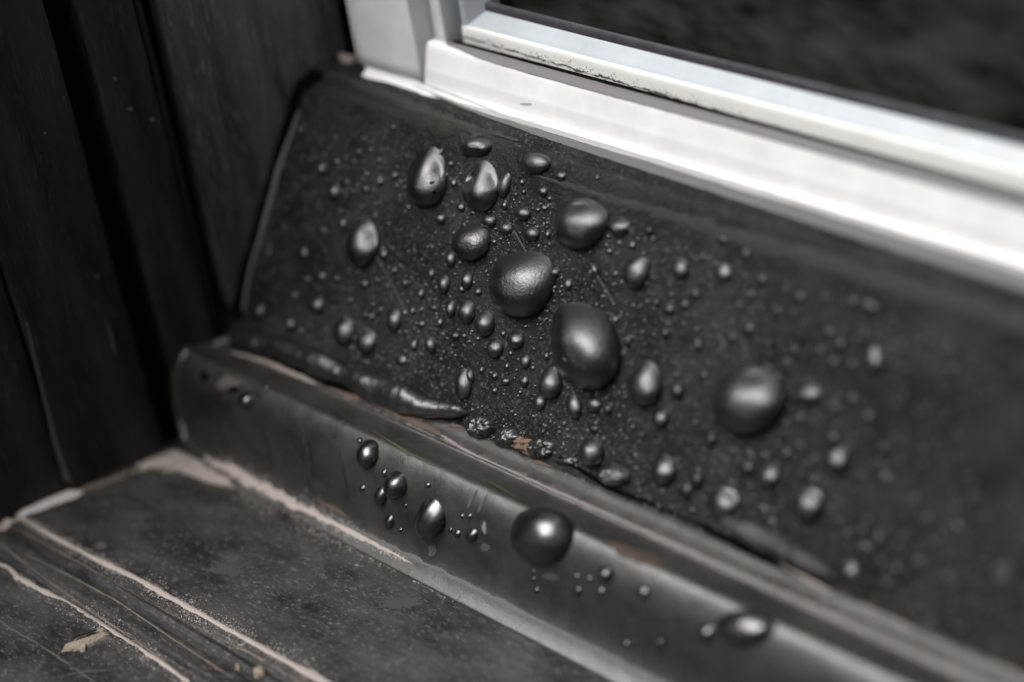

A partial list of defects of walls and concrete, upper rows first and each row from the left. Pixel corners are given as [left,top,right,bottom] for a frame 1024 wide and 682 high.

mould [461,36,785,129]
peeling [526,437,556,459]
damp [467,490,490,551]